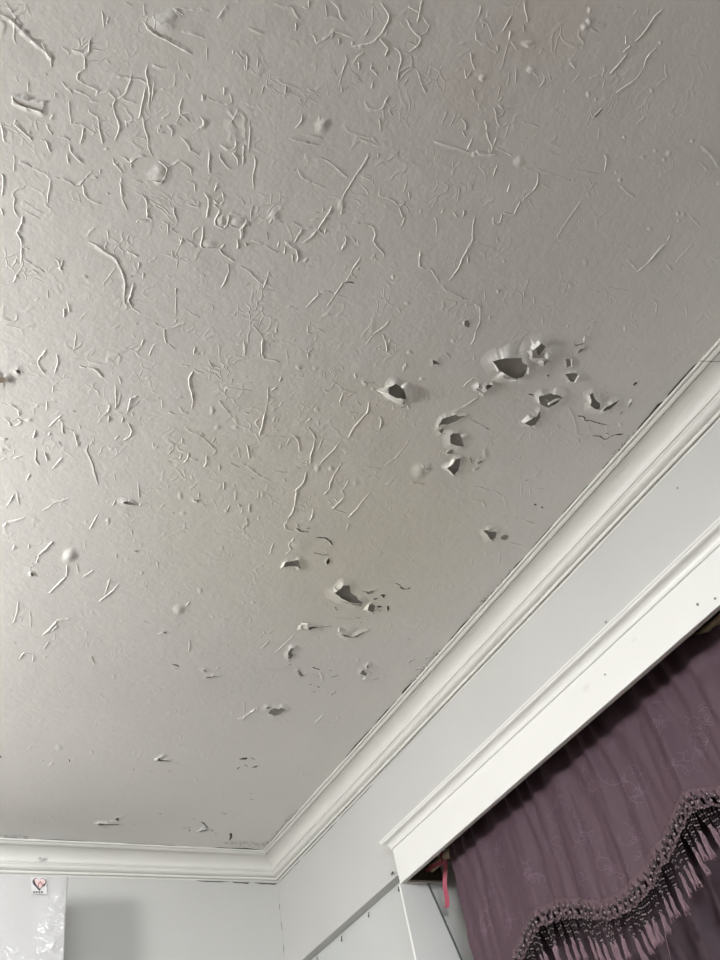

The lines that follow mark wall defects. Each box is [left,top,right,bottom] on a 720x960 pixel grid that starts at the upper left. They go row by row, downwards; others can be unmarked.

peeling [354,373,414,409]
peeling [471,332,642,430]
peeling [408,408,490,481]
peeling [478,524,511,542]
peeling [324,578,393,615]
peeling [265,622,371,678]
peeling [260,702,291,719]